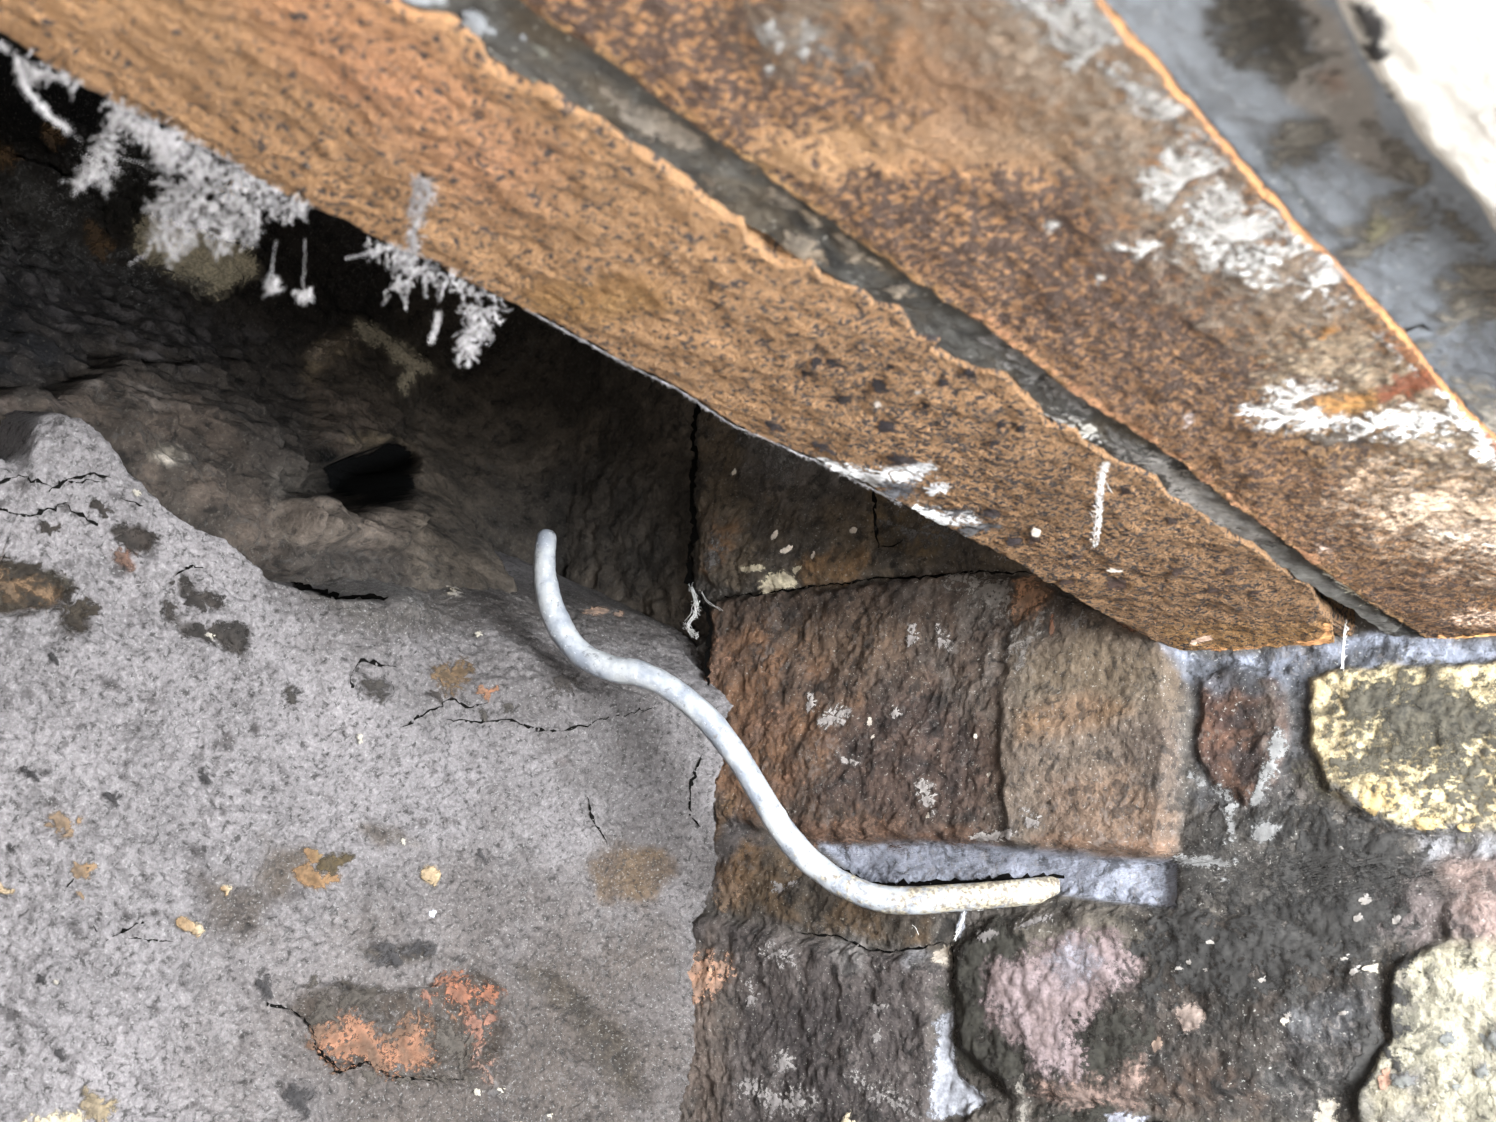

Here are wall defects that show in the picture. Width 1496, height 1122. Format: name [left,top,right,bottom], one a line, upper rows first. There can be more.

leakage [0,129,180,311]
leakage [742,0,1496,583]
crack [684,400,1033,686]
efflorescence [1452,609,1496,625]